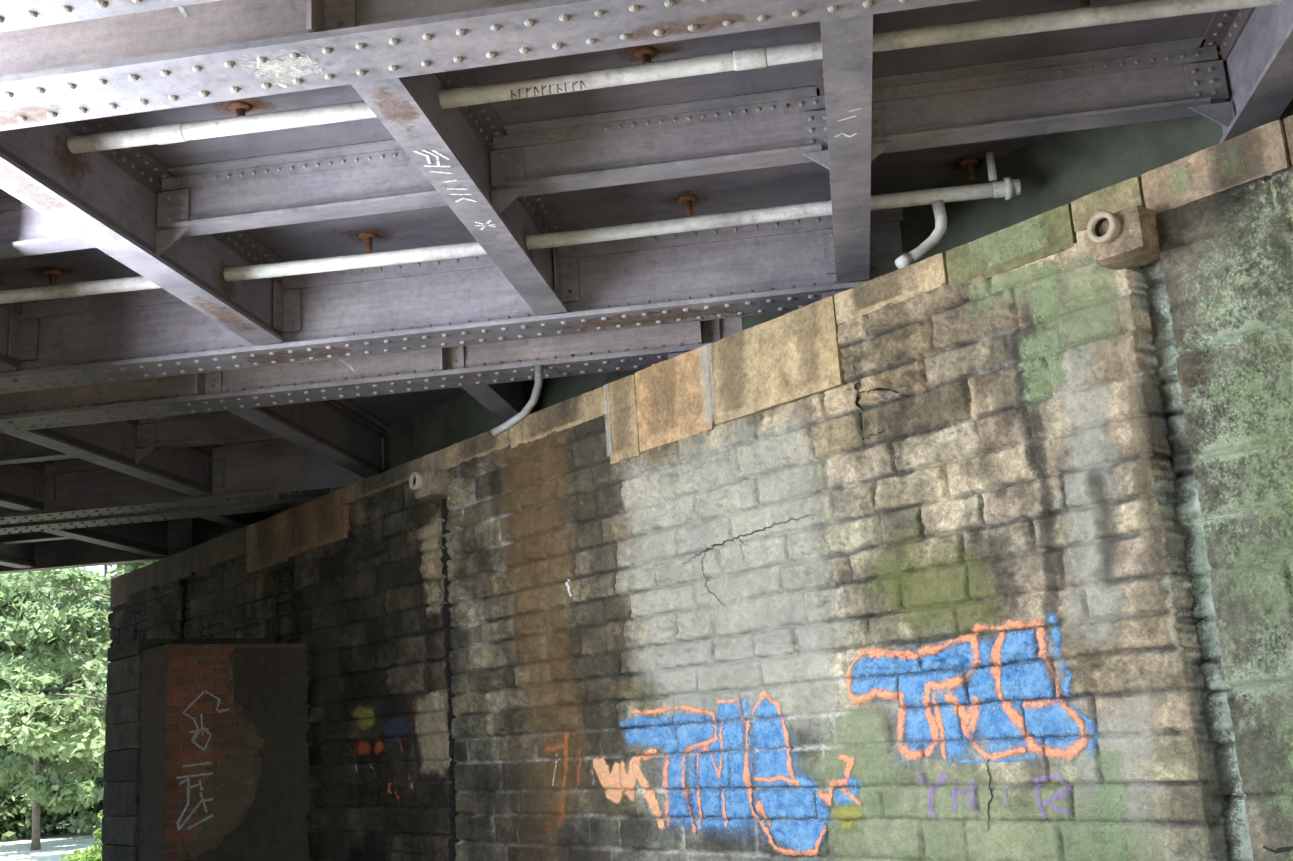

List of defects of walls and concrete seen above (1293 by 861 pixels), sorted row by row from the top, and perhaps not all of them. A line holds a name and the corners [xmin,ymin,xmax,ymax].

corrosion [623,15,741,62]
corrosion [0,106,50,126]
peeling [185,648,311,861]
crack [1263,845,1293,853]